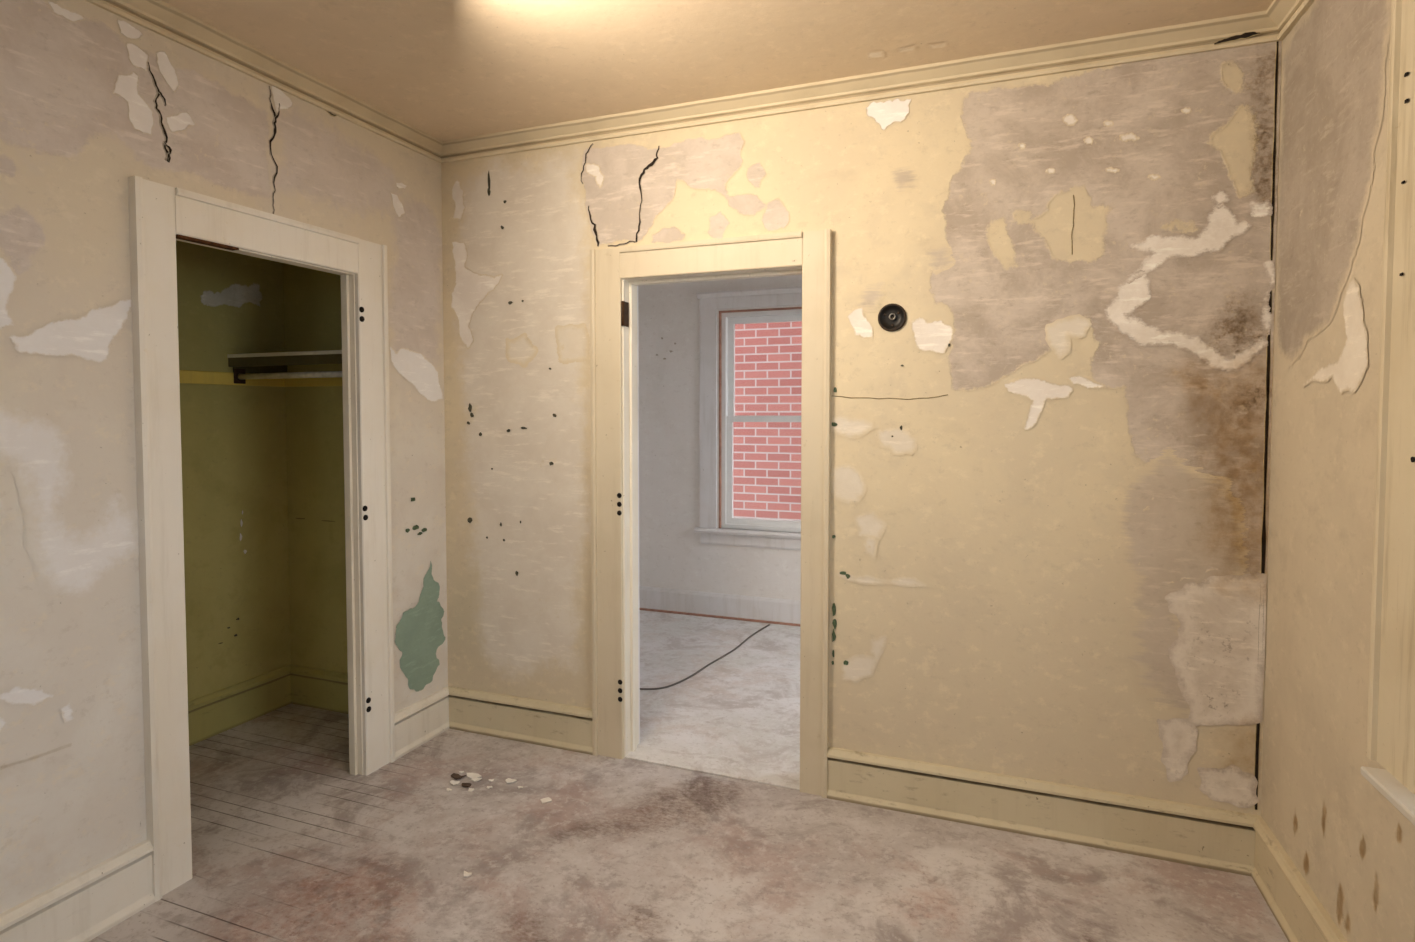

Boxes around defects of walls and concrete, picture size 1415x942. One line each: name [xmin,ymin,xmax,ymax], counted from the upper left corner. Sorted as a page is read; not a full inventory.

crack [147,62,172,163]
crack [268,86,280,214]
crack [581,144,660,247]
peeling [865,98,912,130]
peeling [889,166,919,195]
peeling [0,0,790,694]
peeling [847,280,886,339]
peeling [911,0,1391,808]
peeling [0,685,76,732]